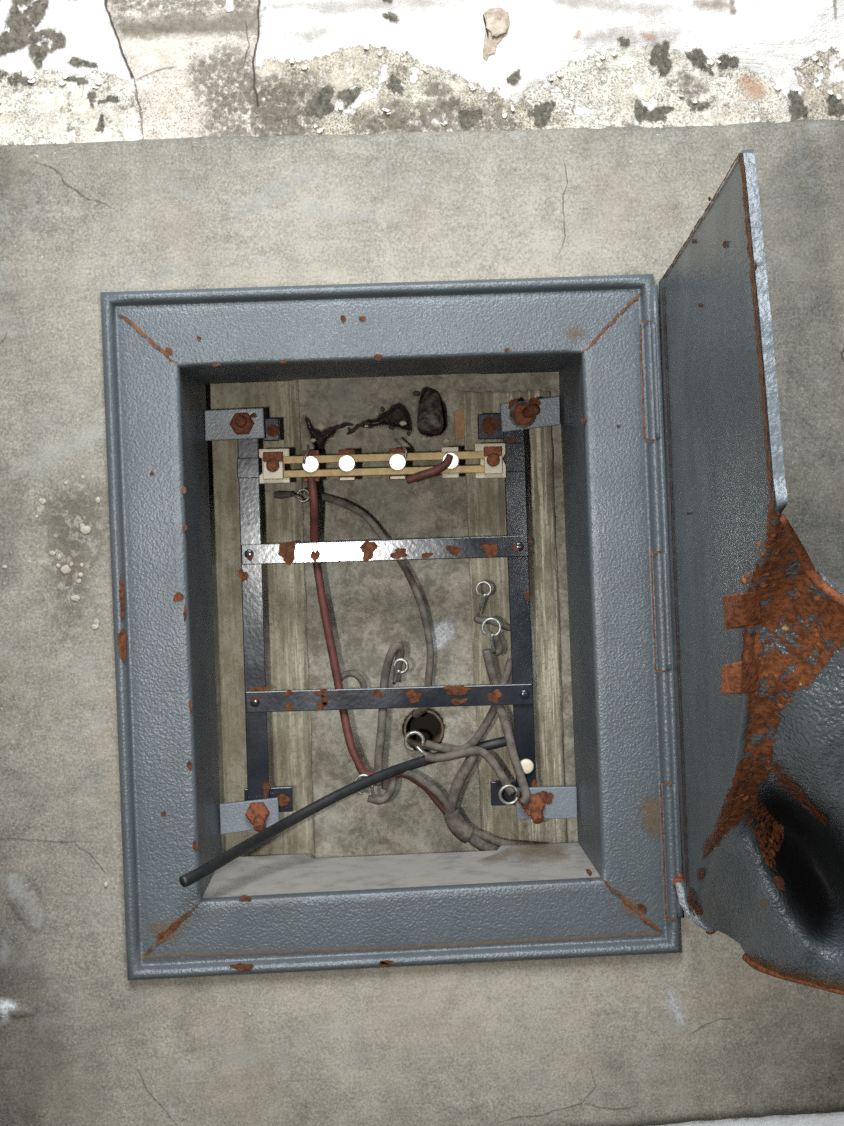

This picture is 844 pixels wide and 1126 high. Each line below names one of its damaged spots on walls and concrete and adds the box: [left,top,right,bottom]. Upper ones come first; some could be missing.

leakage [0,0,120,132]
crack [105,0,133,78]
crack [252,0,260,107]
flaking render [483,7,510,60]
peeling [250,43,844,137]